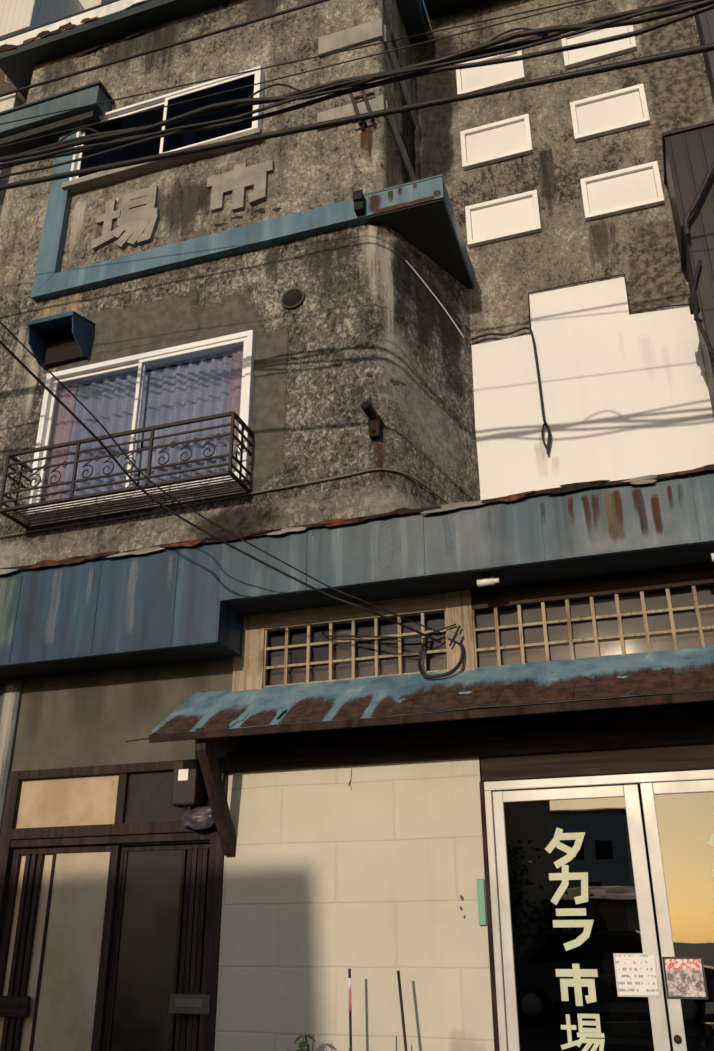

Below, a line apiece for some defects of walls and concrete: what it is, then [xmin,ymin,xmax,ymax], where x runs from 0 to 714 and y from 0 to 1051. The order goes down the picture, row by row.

rust [370,183,440,213]
leakage [310,226,462,364]
rust [568,491,638,538]
rust [651,487,672,532]
rust [155,663,714,733]